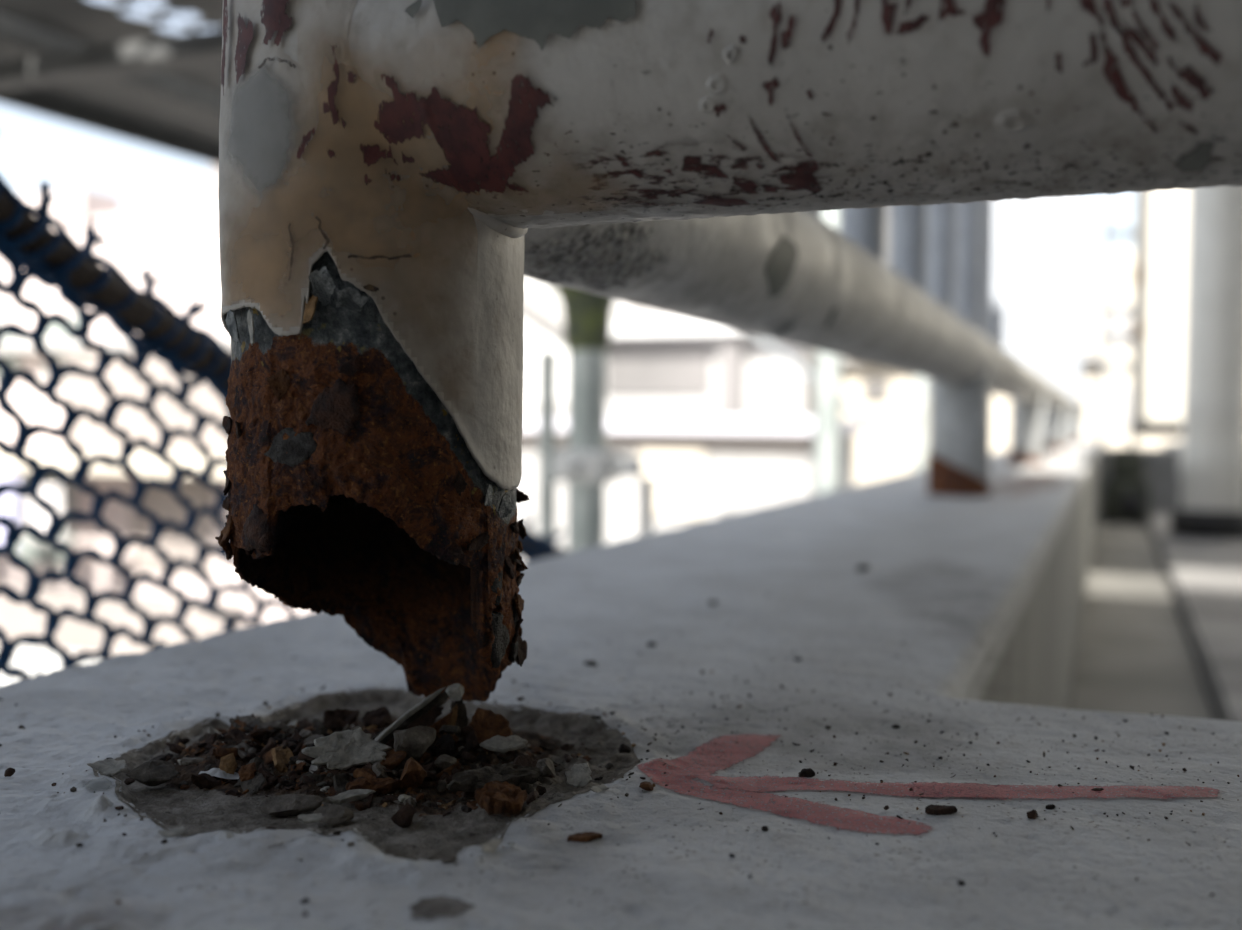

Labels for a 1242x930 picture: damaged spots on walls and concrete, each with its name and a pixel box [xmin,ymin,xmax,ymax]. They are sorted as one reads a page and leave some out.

peeling [405,0,635,50]
peeling [229,68,291,192]
peeling [360,144,414,185]
peeling [1175,143,1212,171]
peeling [302,266,337,324]
peeling [225,309,255,346]
spalling [255,688,425,734]
spalling [84,698,640,861]
peeling [640,781,654,791]